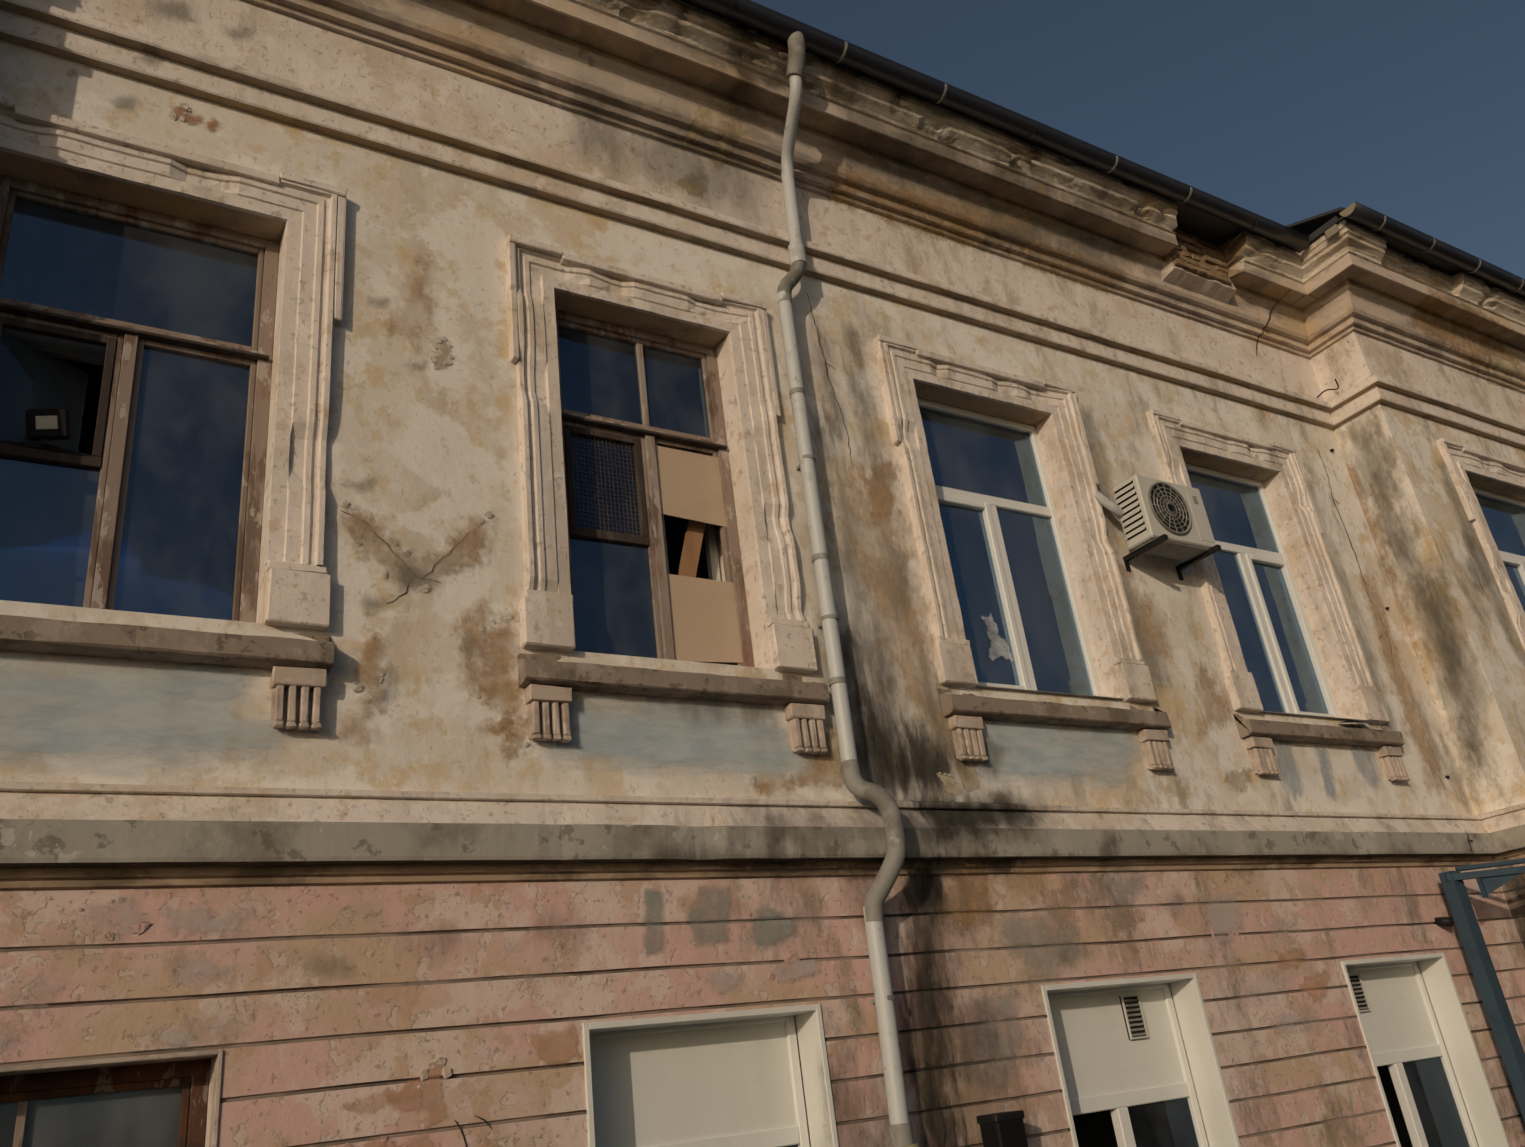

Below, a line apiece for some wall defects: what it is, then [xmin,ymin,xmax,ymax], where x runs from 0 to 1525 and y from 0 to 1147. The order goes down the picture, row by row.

crack [1256,290,1290,354]
flaking render [439,511,494,573]
water stain [862,461,931,702]
water stain [1361,576,1443,787]
water stain [843,638,1021,839]
peeling [531,1026,579,1065]
water stain [906,862,988,1147]
peeling [343,1057,452,1147]
crack [454,1115,492,1147]